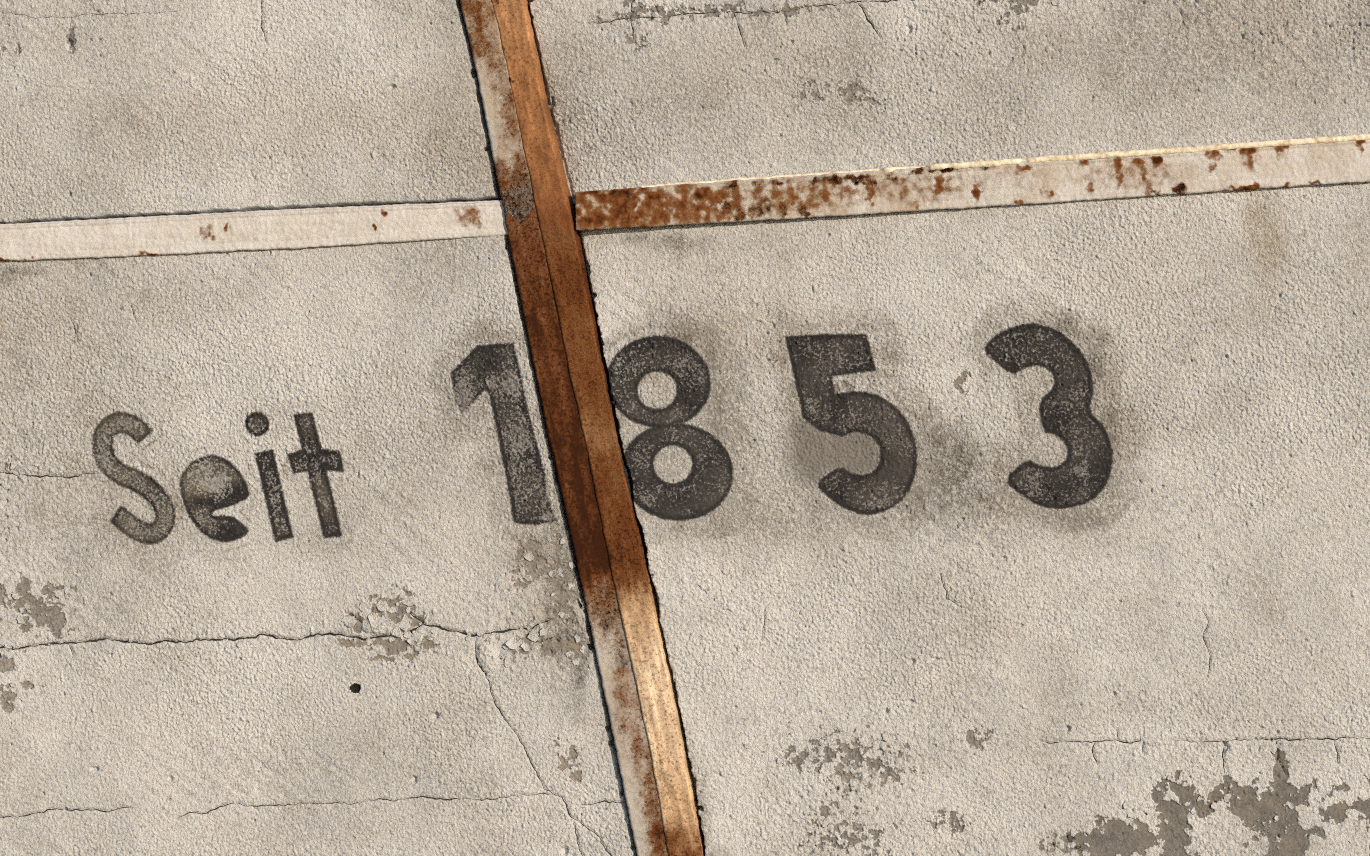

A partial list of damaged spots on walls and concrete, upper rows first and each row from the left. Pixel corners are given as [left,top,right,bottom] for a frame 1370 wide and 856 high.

crack [589,0,897,46]
peeling [973,0,1060,30]
corrosion [1113,156,1187,196]
corrosion [1205,148,1260,191]
corrosion [457,0,958,856]
peeling [0,576,77,714]
peeling [325,586,439,667]
crack [0,612,622,856]
peeling [957,720,997,755]
peeling [1039,744,1370,856]